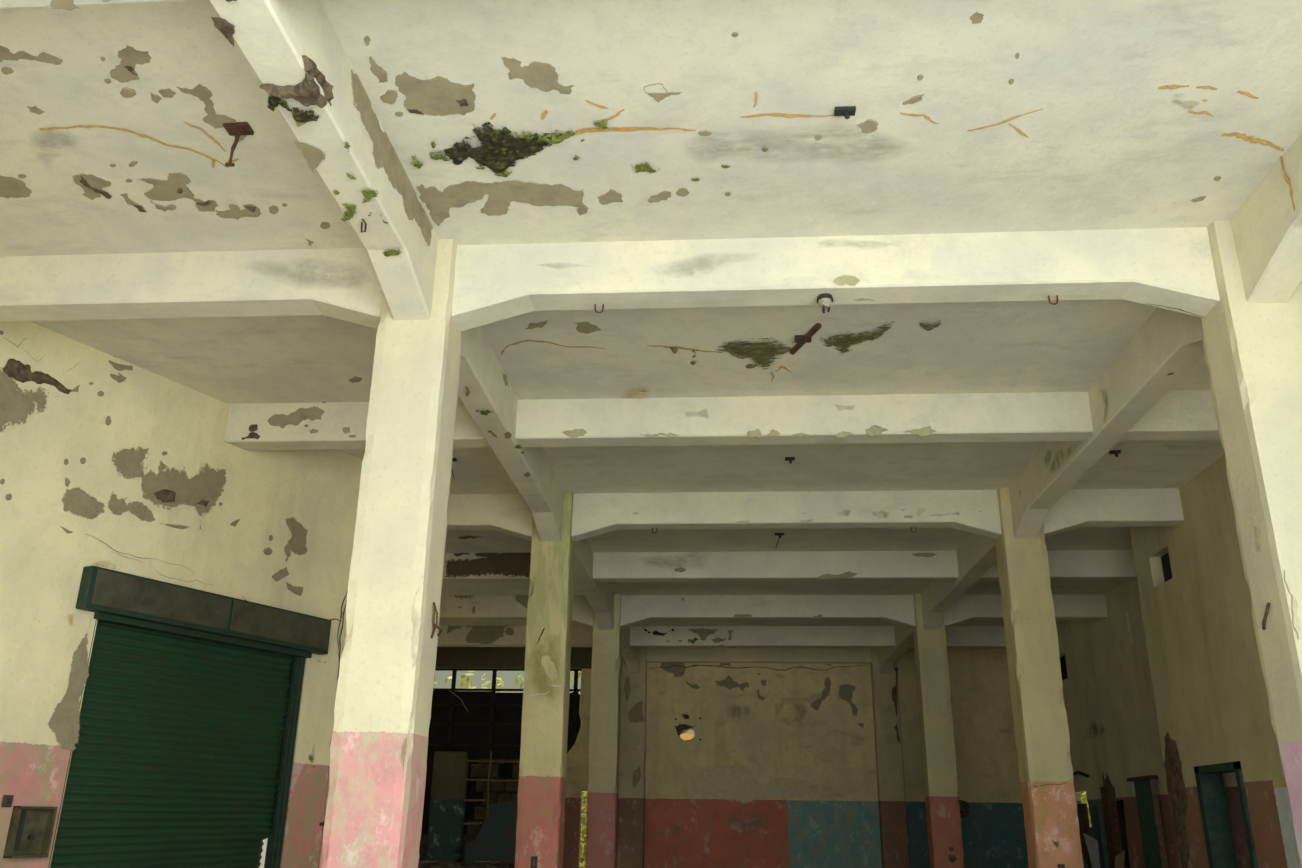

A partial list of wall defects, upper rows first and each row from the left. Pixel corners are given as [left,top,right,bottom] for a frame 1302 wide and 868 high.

spalling [259,55,334,108]
peeling [295,142,325,173]
peeling [351,36,623,247]
peeling [0,358,104,432]
peeling [108,356,133,383]
peeling [60,447,227,534]
peeling [263,517,308,596]
peeling [48,634,89,751]
spalling [674,713,702,741]
peeling [811,664,864,727]